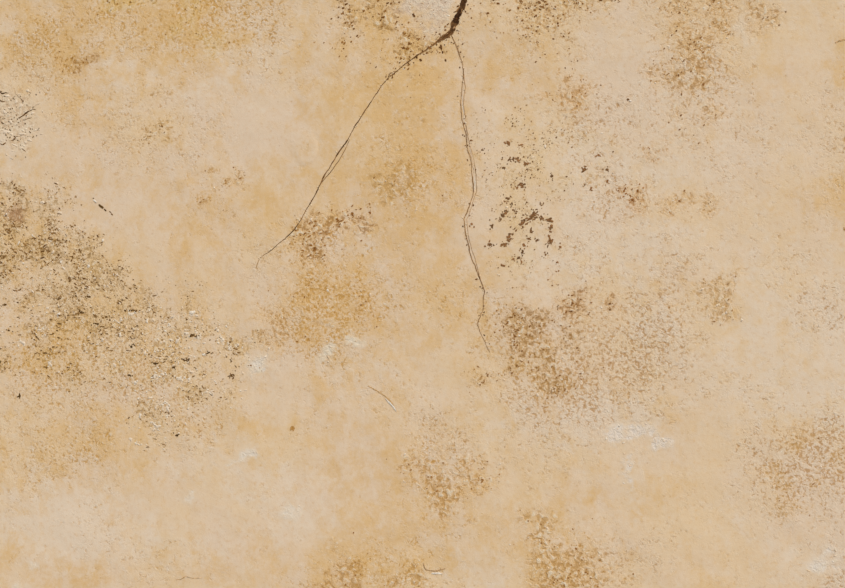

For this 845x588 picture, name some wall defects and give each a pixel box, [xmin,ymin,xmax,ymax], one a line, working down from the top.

crack [256,0,490,352]